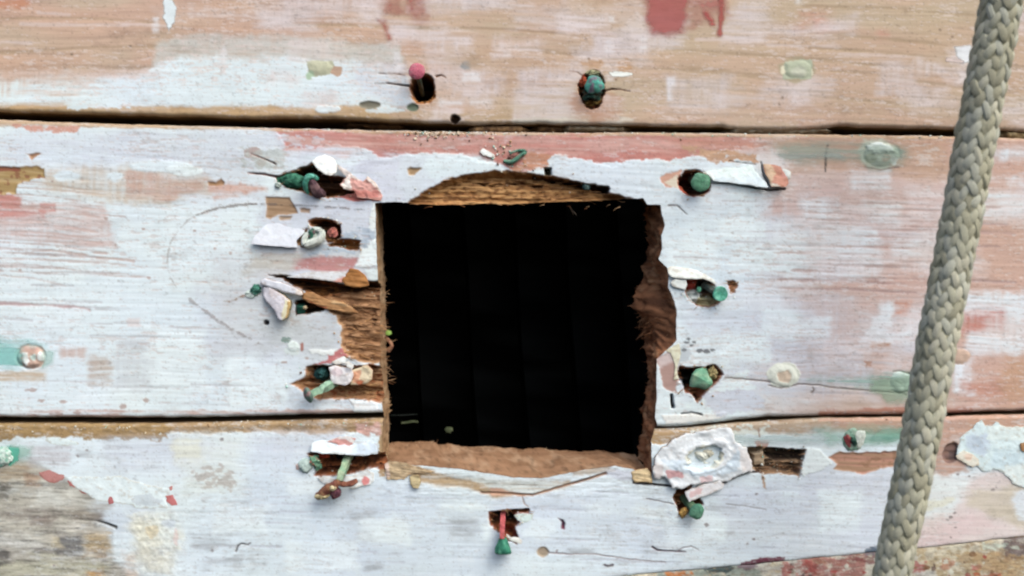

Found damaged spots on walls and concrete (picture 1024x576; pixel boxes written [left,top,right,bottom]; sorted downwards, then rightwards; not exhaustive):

peeling [286,114,758,201]
peeling [703,164,791,187]
peeling [0,153,113,248]
peeling [251,196,311,248]
peeling [288,271,346,282]
crack [724,370,910,395]
peeling [311,436,378,456]
peeling [956,420,1024,487]
peeling [39,470,178,509]
peeling [318,469,374,489]
crack [480,472,608,508]
peeling [514,513,533,522]